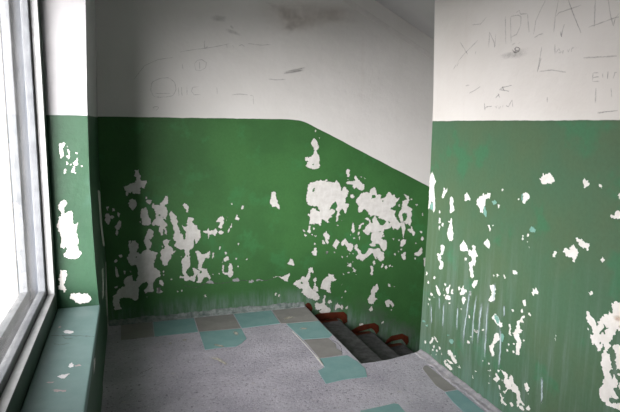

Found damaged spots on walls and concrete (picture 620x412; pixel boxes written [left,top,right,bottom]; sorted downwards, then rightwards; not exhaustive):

peeling [58,142,83,174]
peeling [305,129,320,170]
peeling [56,200,82,259]
peeling [98,190,122,246]
peeling [102,169,244,332]
peeling [303,169,478,312]
peeling [464,192,500,217]
peeling [552,237,590,263]
peeling [58,269,92,304]
peeling [273,267,348,313]
peeling [482,299,531,411]
peeling [586,300,620,411]